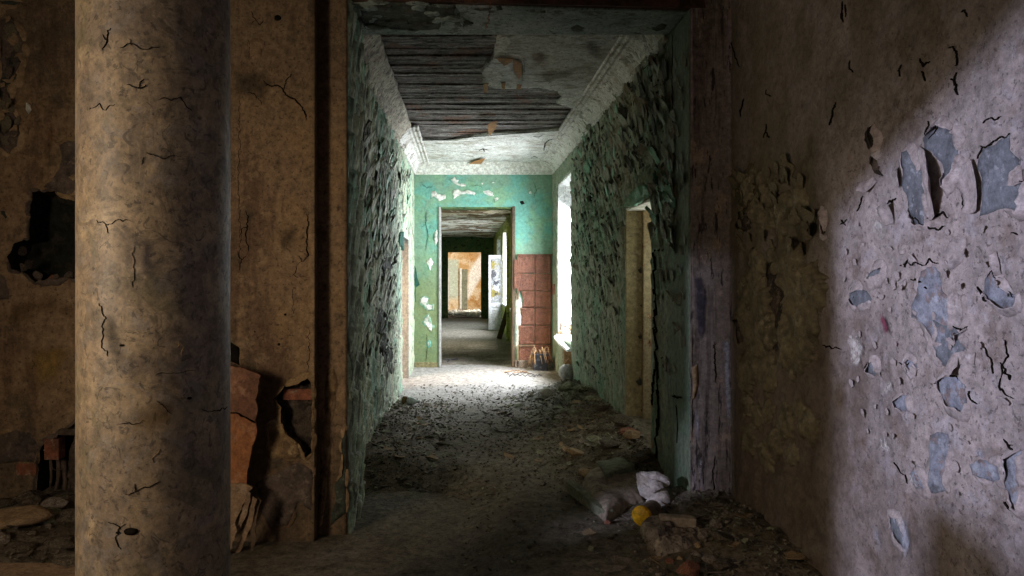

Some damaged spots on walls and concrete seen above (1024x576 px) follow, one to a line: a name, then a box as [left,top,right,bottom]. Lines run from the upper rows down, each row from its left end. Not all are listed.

crack [102,28,159,50]
crack [90,79,192,111]
flaking render [356,0,571,138]
crack [897,46,959,95]
flaking render [39,136,75,201]
crack [237,74,307,270]
peeling [362,63,411,383]
peeling [558,23,676,384]
peeling [899,115,1024,233]
crack [98,303,108,356]
flaking render [256,367,349,531]
peeling [842,246,1024,521]